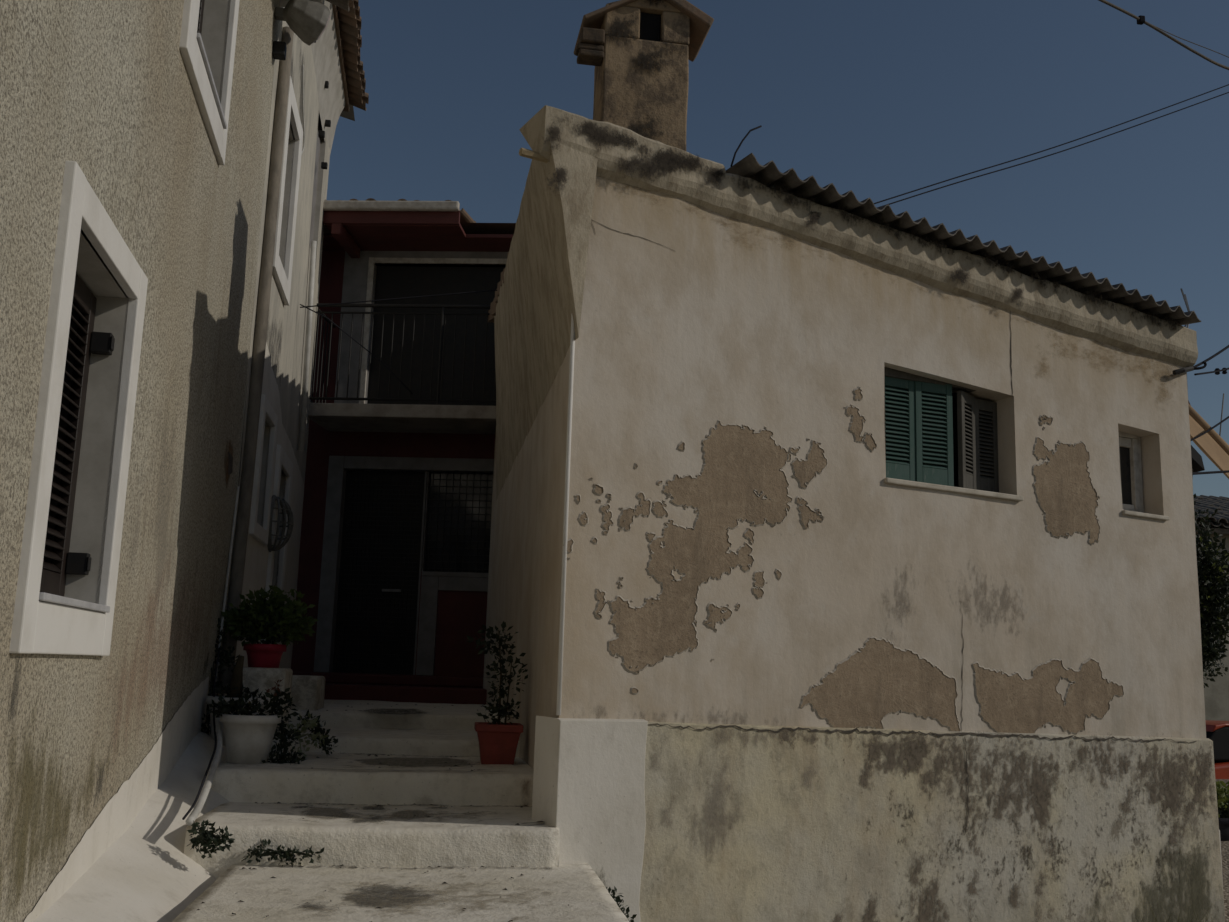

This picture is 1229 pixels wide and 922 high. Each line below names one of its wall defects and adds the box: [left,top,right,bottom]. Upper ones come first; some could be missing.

water stain [623,115,735,188]
crack [1007,311,1015,396]
peeling [843,386,877,453]
peeling [1032,414,1100,546]
peeling [574,420,828,695]
peeling [799,636,961,732]
crack [648,612,1197,835]
peeling [971,657,1124,735]
water stain [779,729,1216,922]